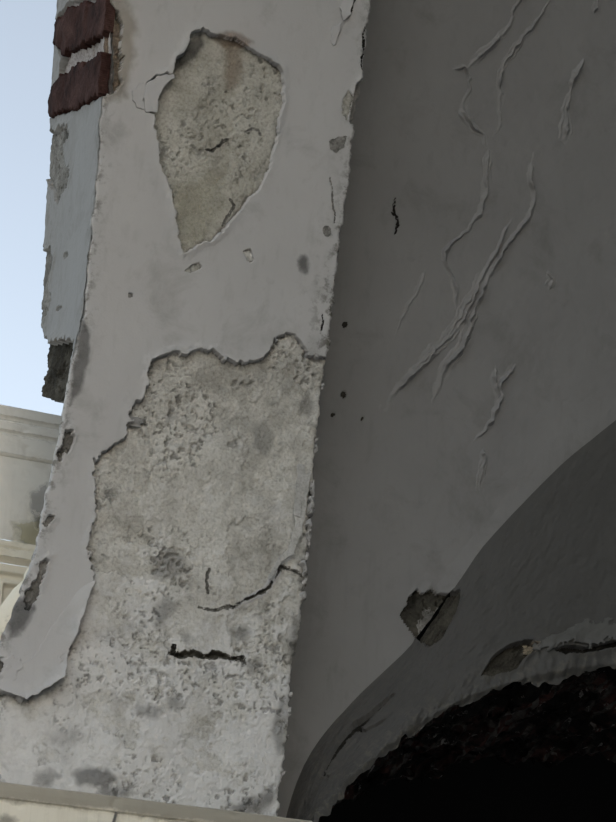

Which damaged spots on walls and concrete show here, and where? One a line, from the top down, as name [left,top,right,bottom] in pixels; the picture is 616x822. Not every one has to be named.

flaking render [48,0,121,118]
flaking render [132,31,283,253]
crack [391,198,400,235]
flaking render [0,334,325,816]
crack [198,564,303,612]
flaking render [400,590,460,646]
peeling [481,617,616,677]